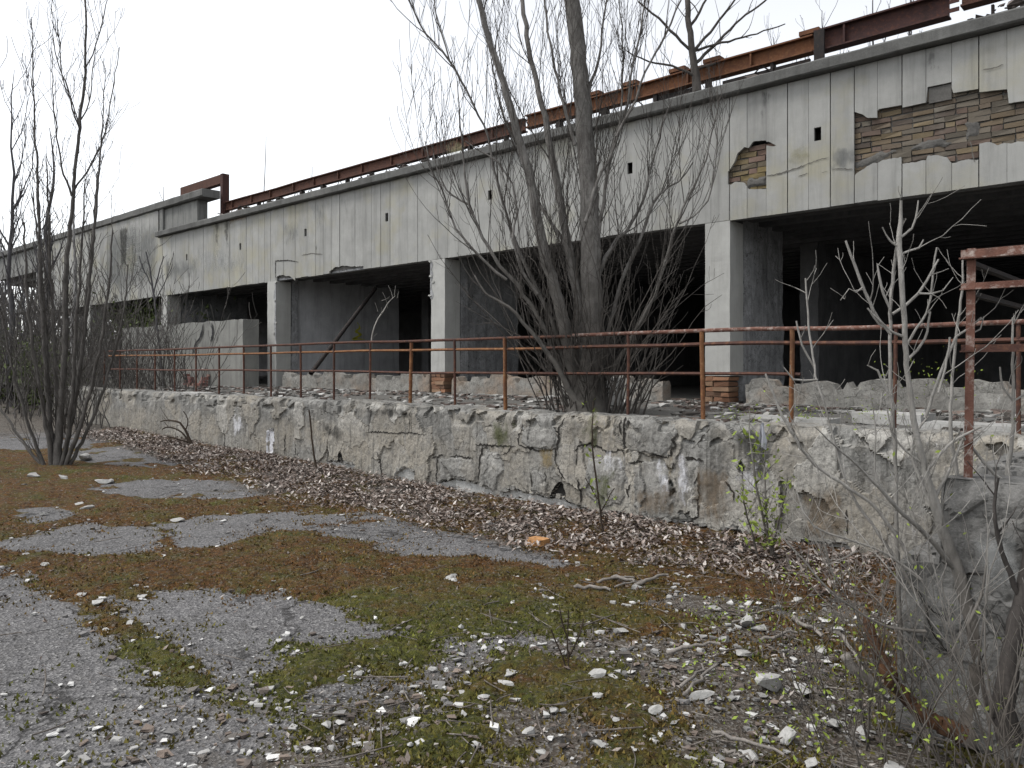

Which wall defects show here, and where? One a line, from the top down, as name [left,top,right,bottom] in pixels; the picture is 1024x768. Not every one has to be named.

flaking render [729,143,776,197]
flaking render [855,64,1024,176]
crack [366,411,735,523]